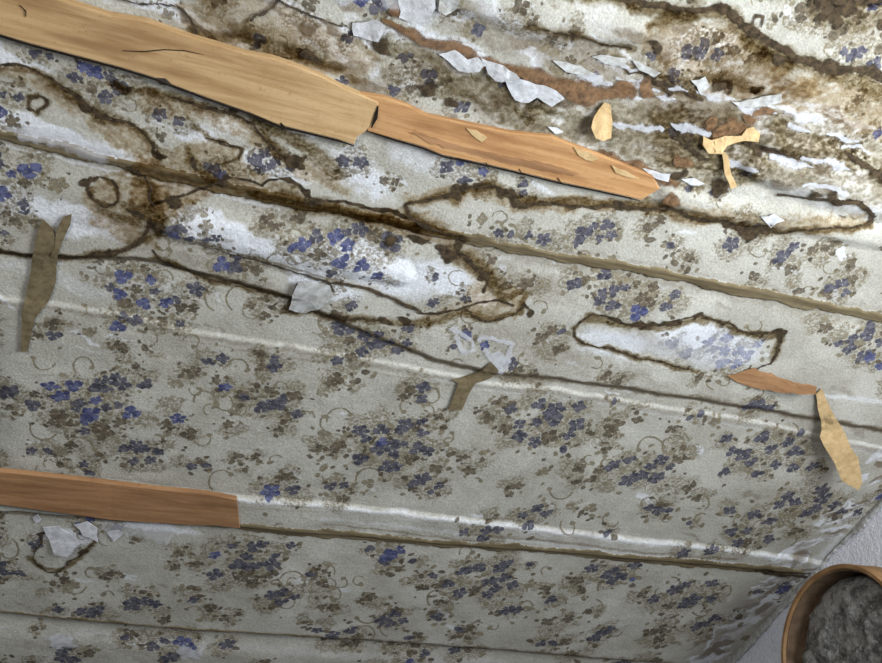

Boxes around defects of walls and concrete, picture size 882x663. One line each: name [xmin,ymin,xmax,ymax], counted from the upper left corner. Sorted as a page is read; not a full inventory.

crack [122,0,198,35]
peeling [398,0,459,23]
damp [372,38,391,56]
damp [532,28,636,51]
damp [608,0,882,102]
peeling [439,50,565,107]
peeling [691,76,710,94]
damp [0,62,168,161]
damp [58,80,882,326]
crack [192,243,422,313]
peeling [289,282,333,313]
peeling [32,514,122,557]